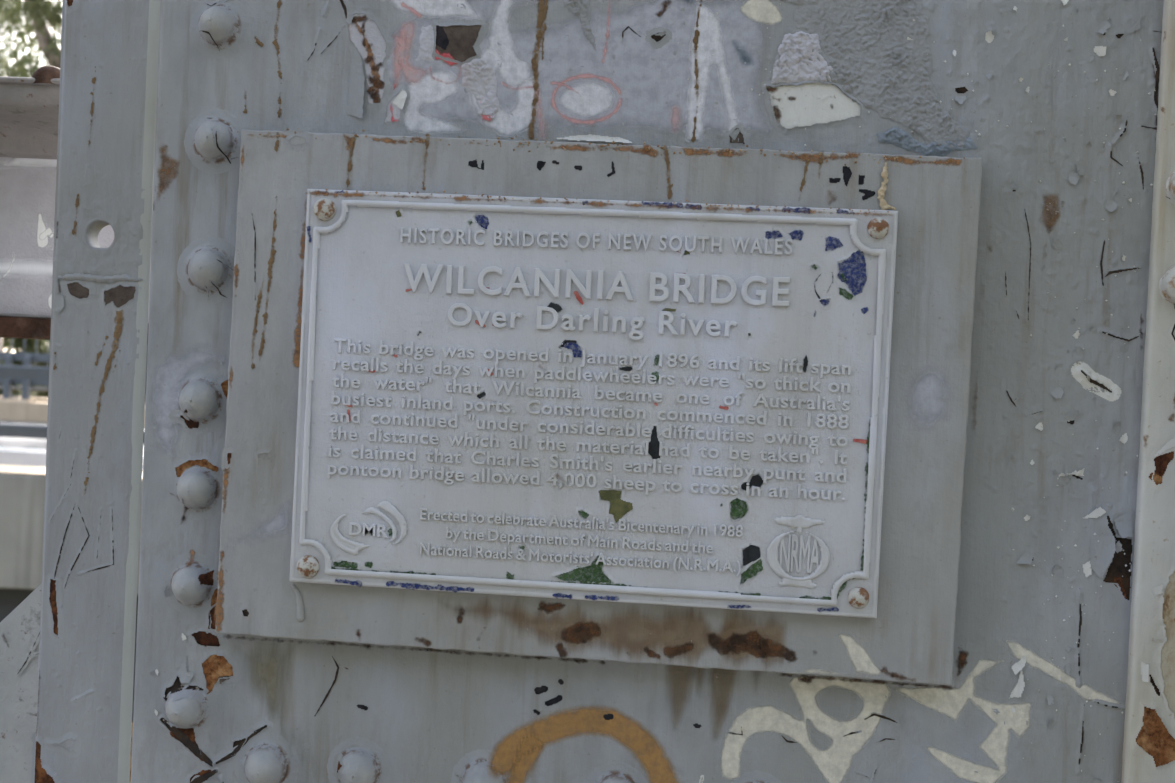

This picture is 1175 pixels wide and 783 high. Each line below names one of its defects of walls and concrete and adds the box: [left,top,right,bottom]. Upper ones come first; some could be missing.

peeling [342,7,410,129]
peeling [415,19,499,122]
rust [528,0,548,139]
rust [684,0,740,157]
spalling [761,0,978,156]
rust [310,136,363,197]
rust [784,152,860,192]
rust [251,196,277,369]
rust [84,310,123,491]
peeling [1056,468,1135,608]
peeling [156,563,257,783]
peeling [1127,559,1175,774]